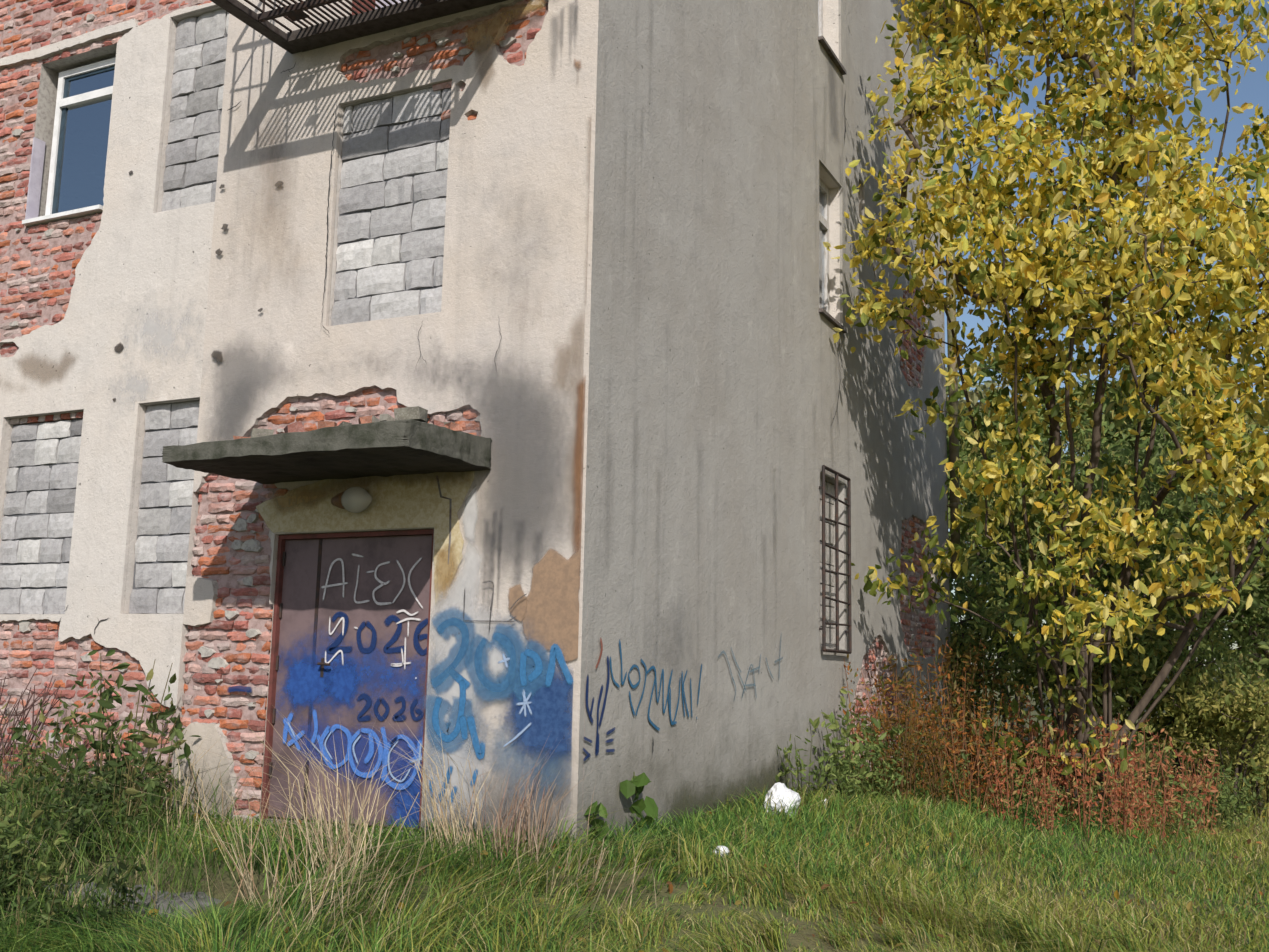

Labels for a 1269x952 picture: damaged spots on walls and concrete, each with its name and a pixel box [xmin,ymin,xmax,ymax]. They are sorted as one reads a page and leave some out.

flaking render [336,0,549,91]
flaking render [441,109,478,121]
flaking render [0,0,217,358]
flaking render [243,385,407,437]
flaking render [427,404,482,436]
flaking render [0,471,475,818]
flaking render [508,549,581,661]
flaking render [900,515,938,658]
flaking render [842,634,915,780]